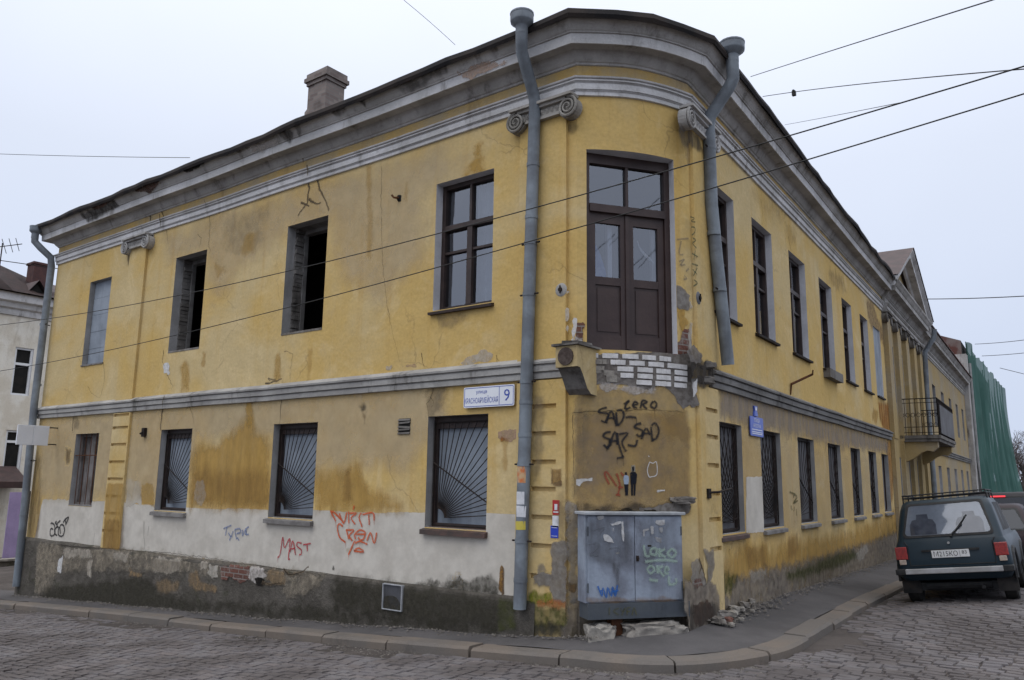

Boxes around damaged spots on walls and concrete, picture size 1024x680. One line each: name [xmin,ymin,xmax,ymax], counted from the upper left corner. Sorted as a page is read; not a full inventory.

crack [298,158,329,215]
spalling [595,285,718,409]
damp [191,402,269,507]
damp [318,468,398,511]
spalling [35,544,315,596]
spalling [691,549,715,589]
damp [622,532,897,631]
damp [562,597,607,639]